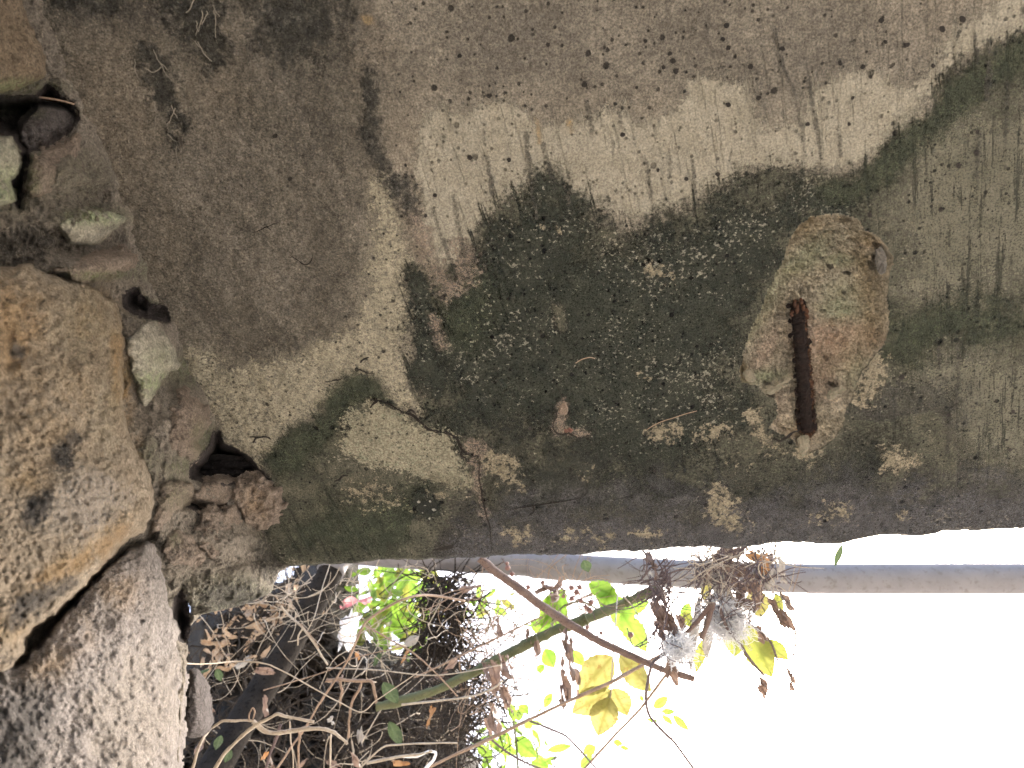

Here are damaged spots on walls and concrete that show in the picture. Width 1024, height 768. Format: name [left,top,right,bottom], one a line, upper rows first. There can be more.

spalling [189,428,269,487]
crack [325,357,587,553]
leakage [183,0,1024,476]
spalling [642,213,894,475]